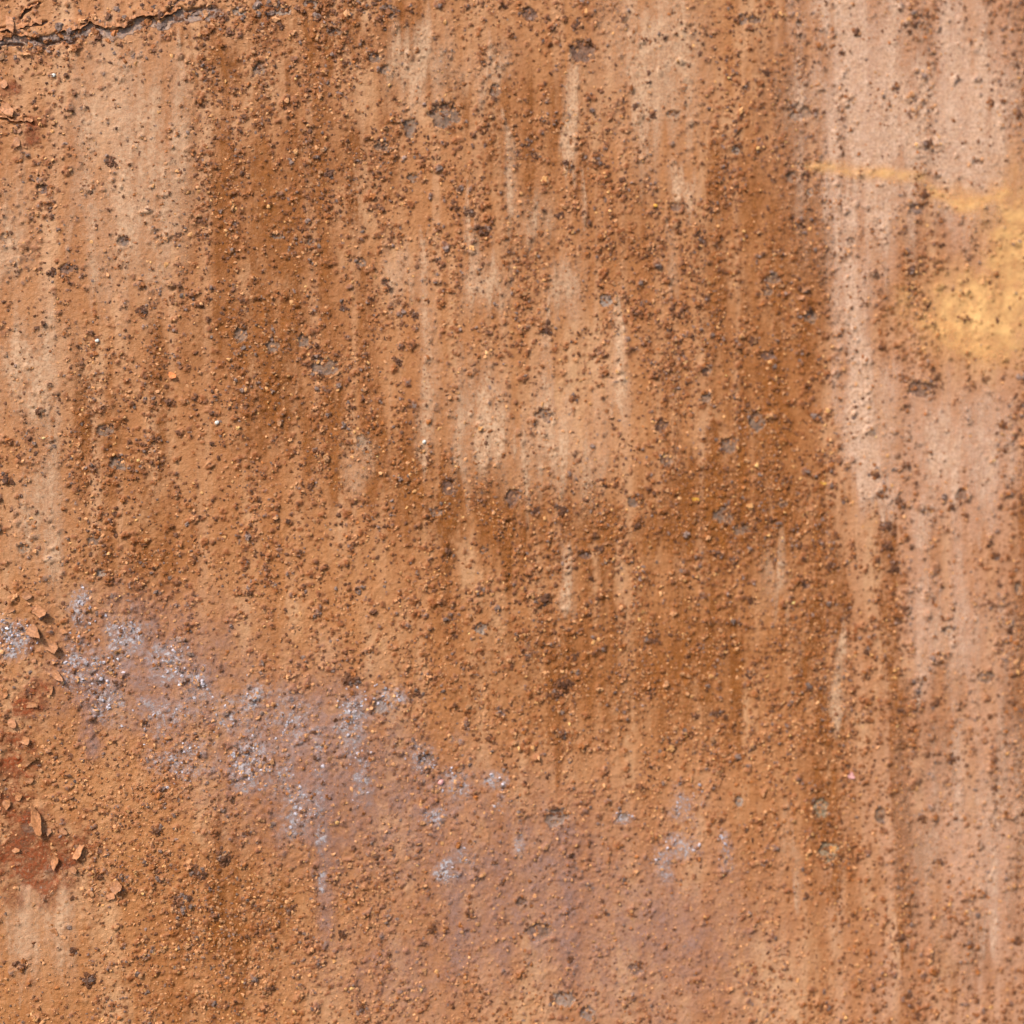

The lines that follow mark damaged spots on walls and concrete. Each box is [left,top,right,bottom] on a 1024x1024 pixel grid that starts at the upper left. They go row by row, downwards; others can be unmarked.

crack [0,0,397,72]
water stain [0,610,39,658]
peeling [4,591,67,663]
peeling [0,670,93,903]
water stain [52,585,403,927]
water stain [405,744,509,840]
water stain [648,783,703,878]
peeling [106,880,122,900]
water stain [433,835,574,921]